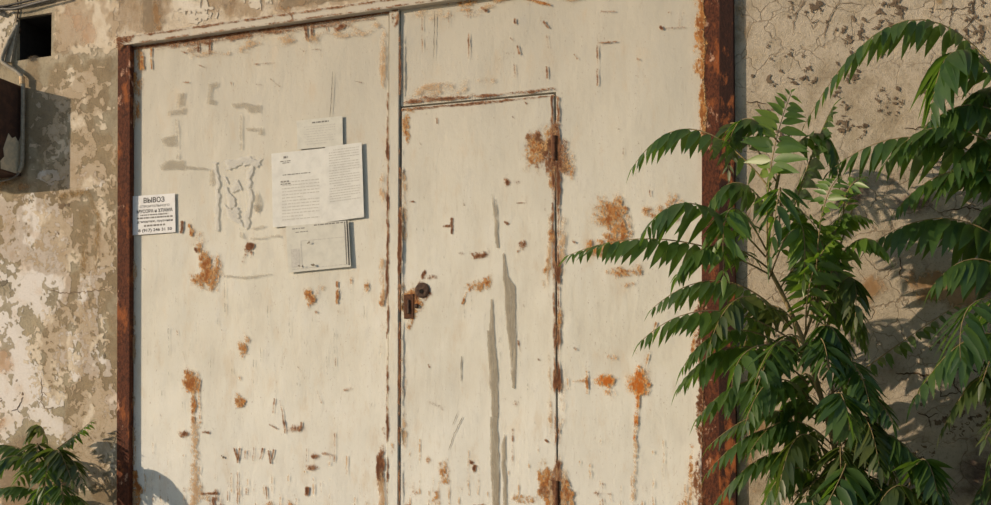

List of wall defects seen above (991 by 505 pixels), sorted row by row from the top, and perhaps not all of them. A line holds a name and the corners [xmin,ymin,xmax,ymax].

peeling [172,0,218,25]
peeling [243,0,272,12]
crack [942,0,975,30]
corrosion [659,0,707,152]
corrosion [642,194,684,218]
peeling [0,0,119,493]
corrosion [114,0,632,505]
corrosion [606,265,641,286]
corrosion [627,354,654,505]